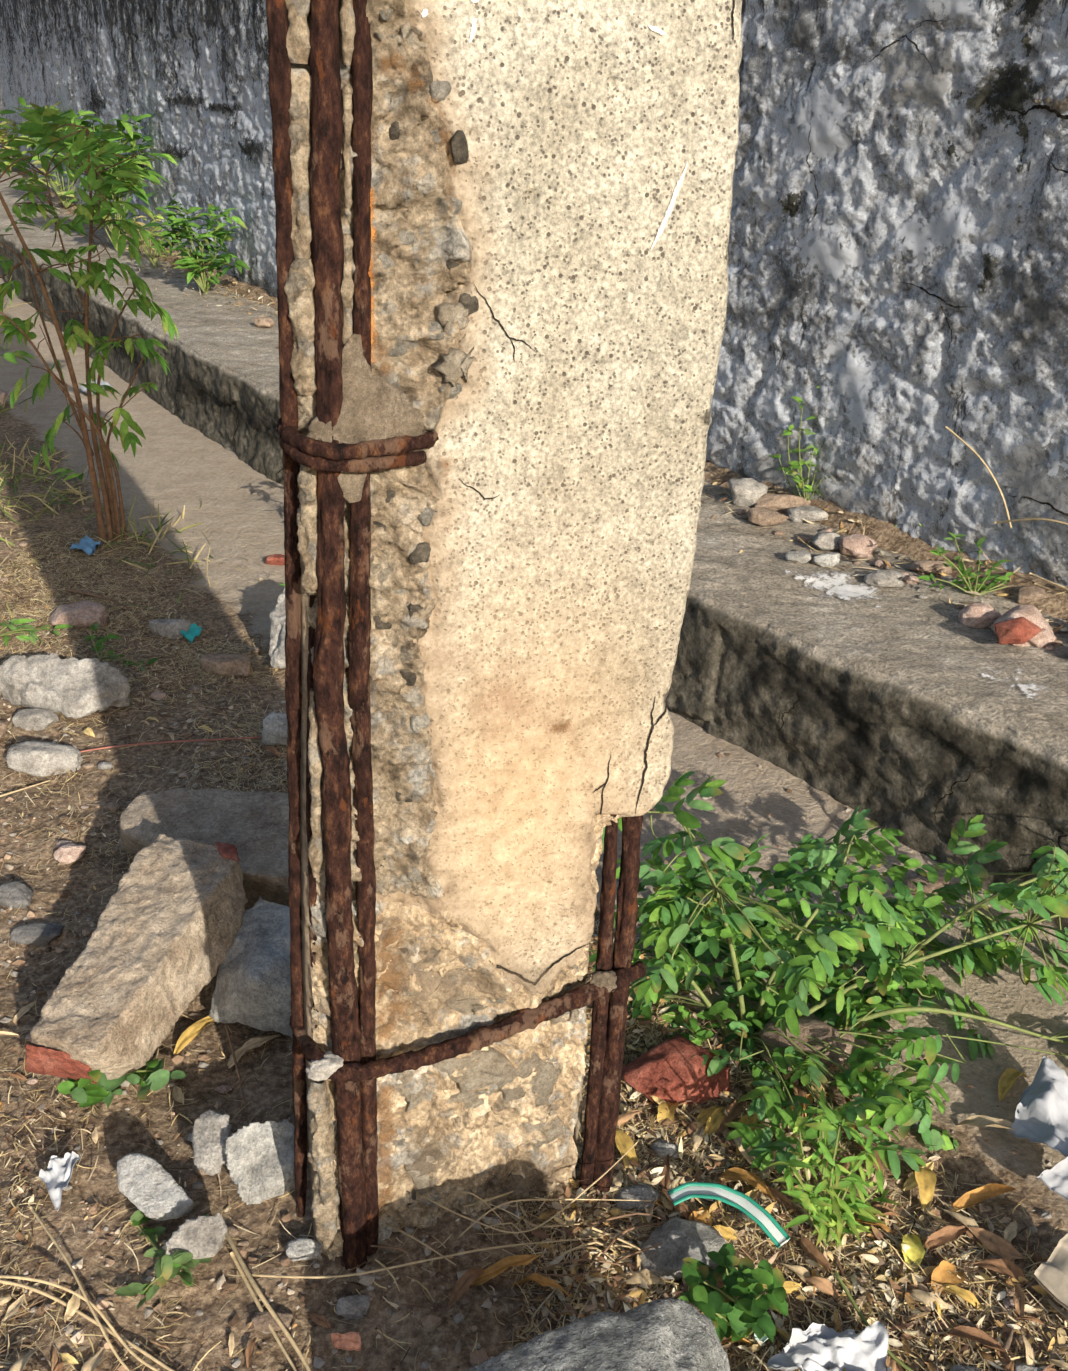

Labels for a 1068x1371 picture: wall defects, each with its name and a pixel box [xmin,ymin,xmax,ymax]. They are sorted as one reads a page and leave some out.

leakage [5,0,269,166]
leakage [128,143,193,182]
leakage [231,268,277,297]
spalling [266,0,479,444]
rust [368,190,388,373]
leakage [947,0,1068,181]
crack [594,696,668,815]
crack [713,684,853,785]
spalling [282,450,643,1272]